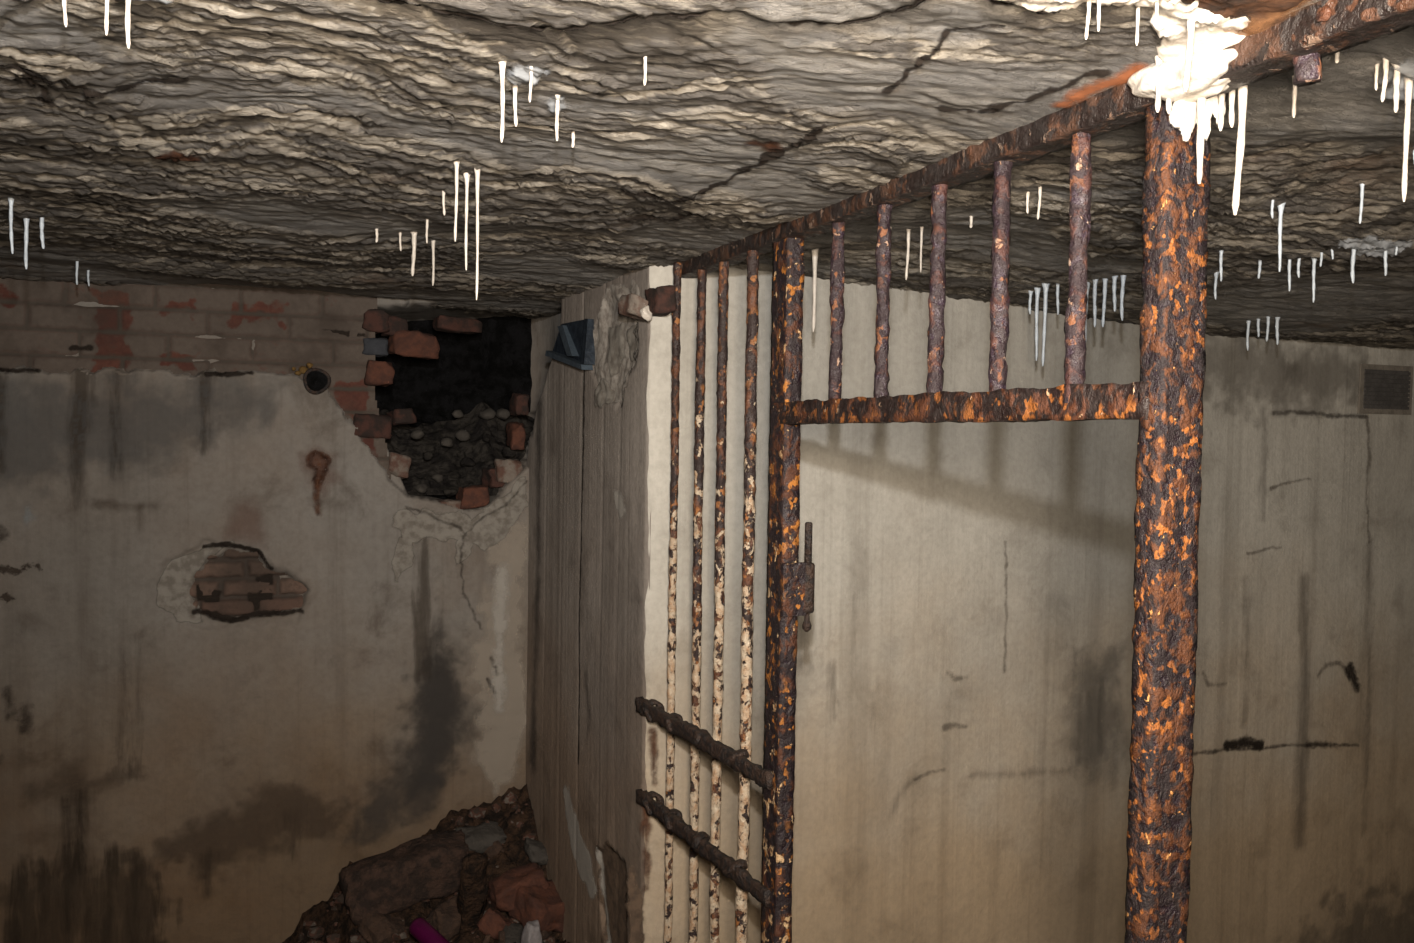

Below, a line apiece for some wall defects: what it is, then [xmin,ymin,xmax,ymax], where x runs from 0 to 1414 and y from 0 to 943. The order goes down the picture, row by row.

corrosion [1185,0,1305,36]
corrosion [1055,64,1145,107]
corrosion [745,140,780,152]
flaking render [0,277,535,583]
spalling [156,541,307,623]
water stain [365,655,465,837]
corrosion [649,729,658,777]
crack [1202,737,1349,753]
corrosion [641,807,651,889]